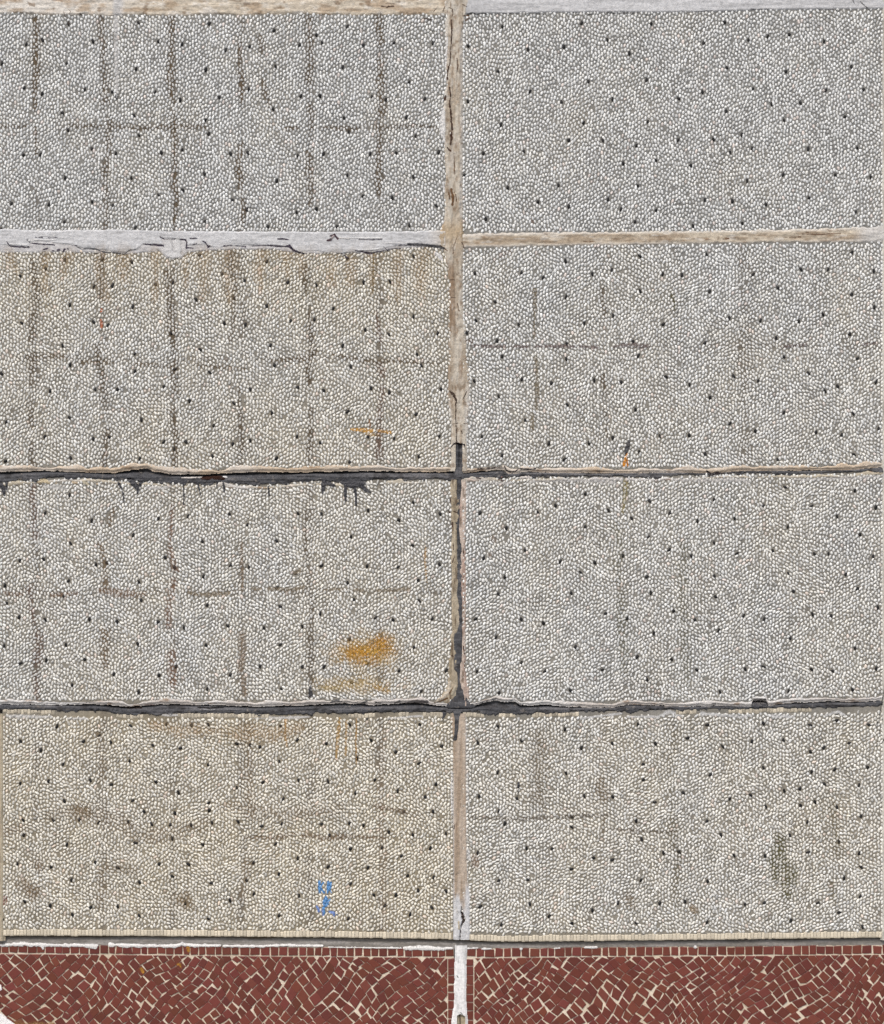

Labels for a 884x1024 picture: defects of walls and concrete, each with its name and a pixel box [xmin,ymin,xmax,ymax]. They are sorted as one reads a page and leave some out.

crack [6,236,304,255]
crack [341,239,412,258]
rust [342,637,388,663]
rust [336,718,357,764]